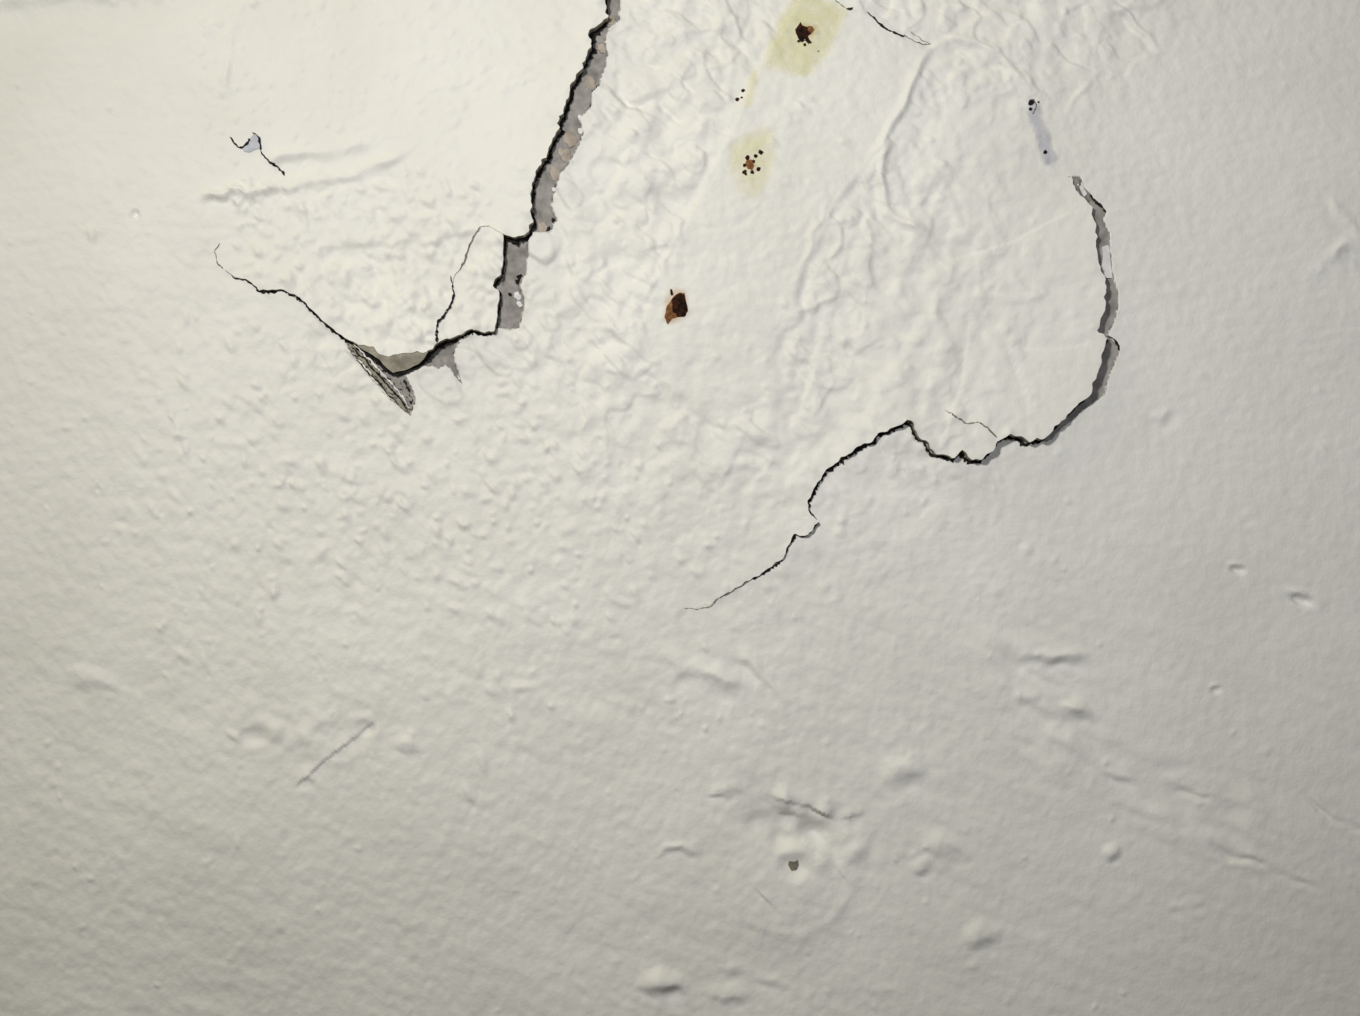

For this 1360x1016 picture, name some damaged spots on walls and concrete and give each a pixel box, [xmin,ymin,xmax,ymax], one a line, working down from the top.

corrosion [776,9,838,65]
crack [835,0,931,45]
crack [214,0,622,416]
corrosion [665,289,688,324]
crack [685,176,1120,610]